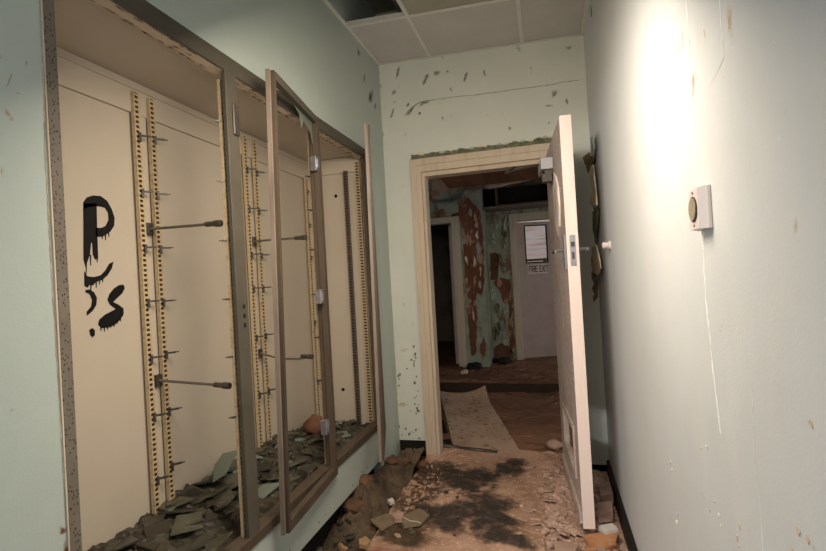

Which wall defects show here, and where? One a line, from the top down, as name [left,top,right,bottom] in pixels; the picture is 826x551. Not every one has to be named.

spalling [450,197,515,359]
peeling [583,134,601,302]
crack [703,230,721,434]